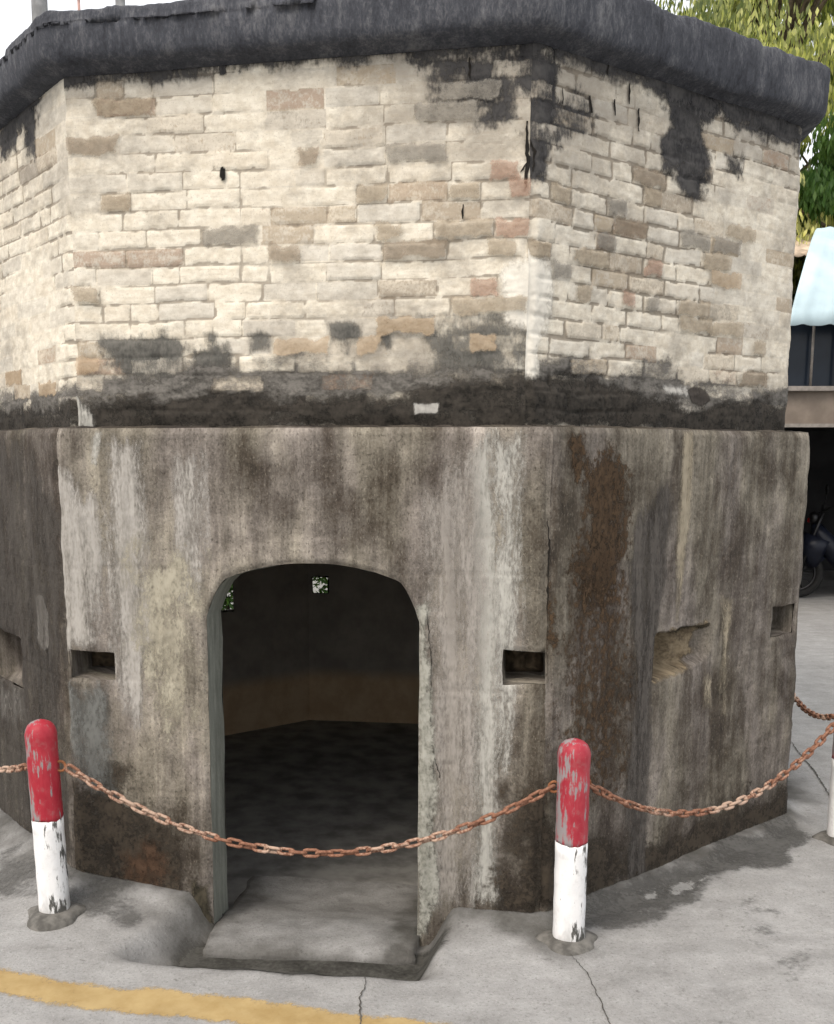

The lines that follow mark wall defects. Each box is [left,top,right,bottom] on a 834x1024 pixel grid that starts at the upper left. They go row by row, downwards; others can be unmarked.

water stain [64,43,802,201]
crack [520,121,537,180]
crack [589,65,640,131]
water stain [98,332,233,383]
water stain [249,331,270,352]
water stain [329,321,360,354]
water stain [546,432,812,928]
crack [358,976,366,1024]
crack [571,954,611,1024]